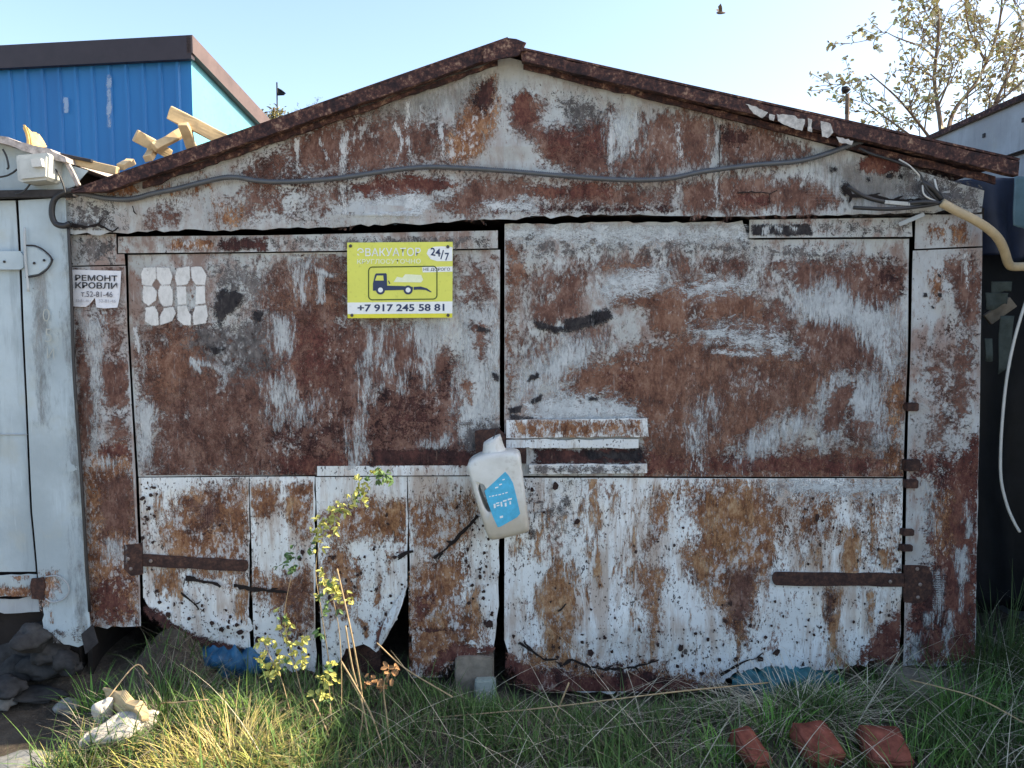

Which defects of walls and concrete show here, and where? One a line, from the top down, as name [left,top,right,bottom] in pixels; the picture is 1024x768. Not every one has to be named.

peeling [746,104,853,145]
rust [74,74,982,692]
spalling [155,589,310,659]
spalling [328,547,403,638]